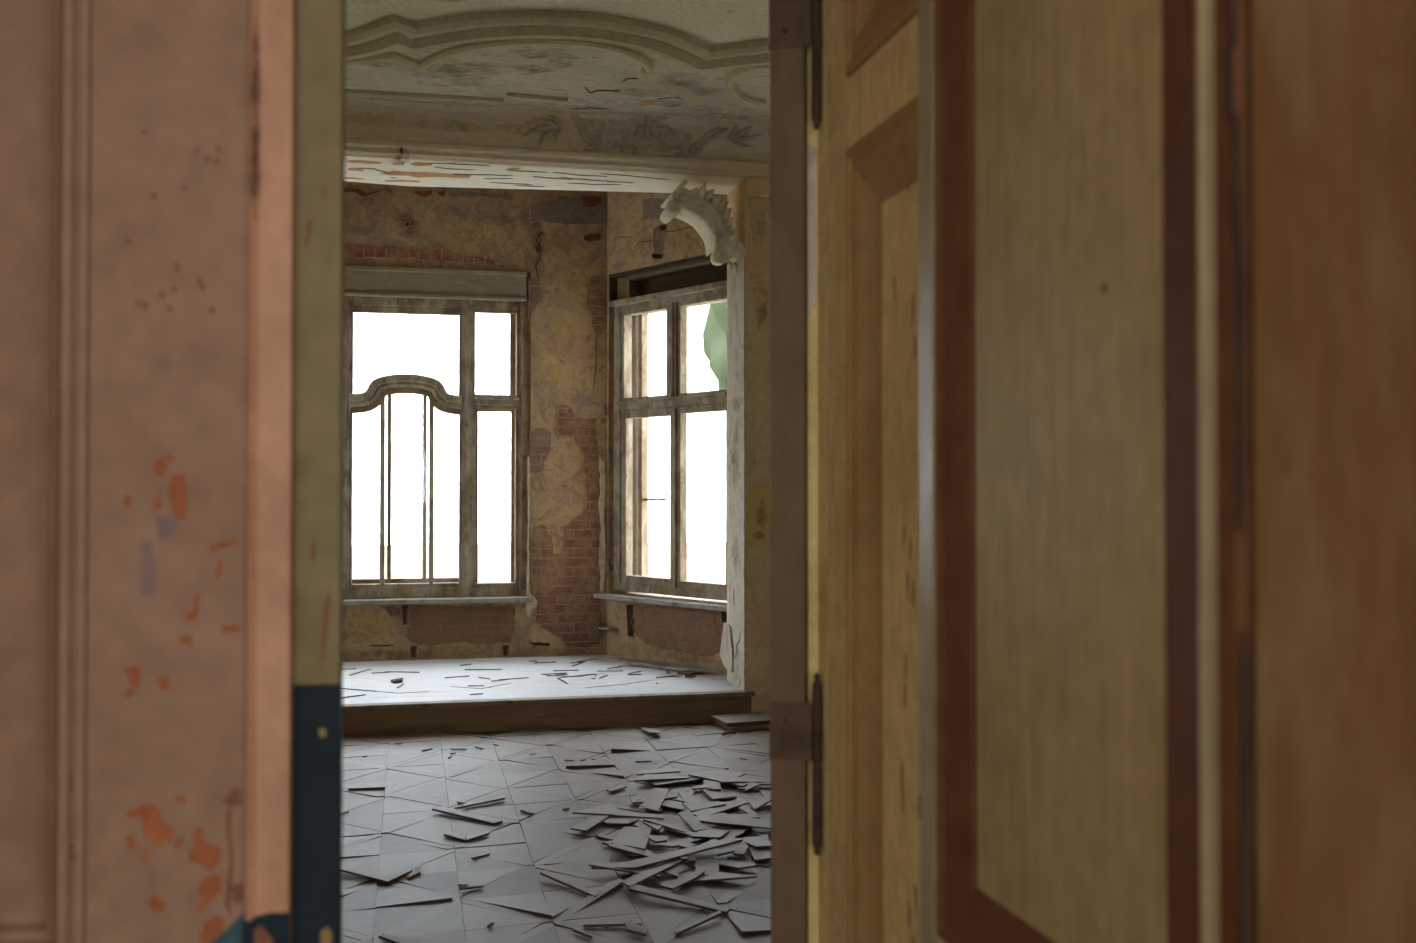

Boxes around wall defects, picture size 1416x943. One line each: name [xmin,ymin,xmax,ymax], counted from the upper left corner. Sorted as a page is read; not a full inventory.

spalling [414,190,513,201]
spalling [530,195,608,226]
spalling [586,275,607,339]
spalling [385,404,606,649]
spalling [631,604,723,659]